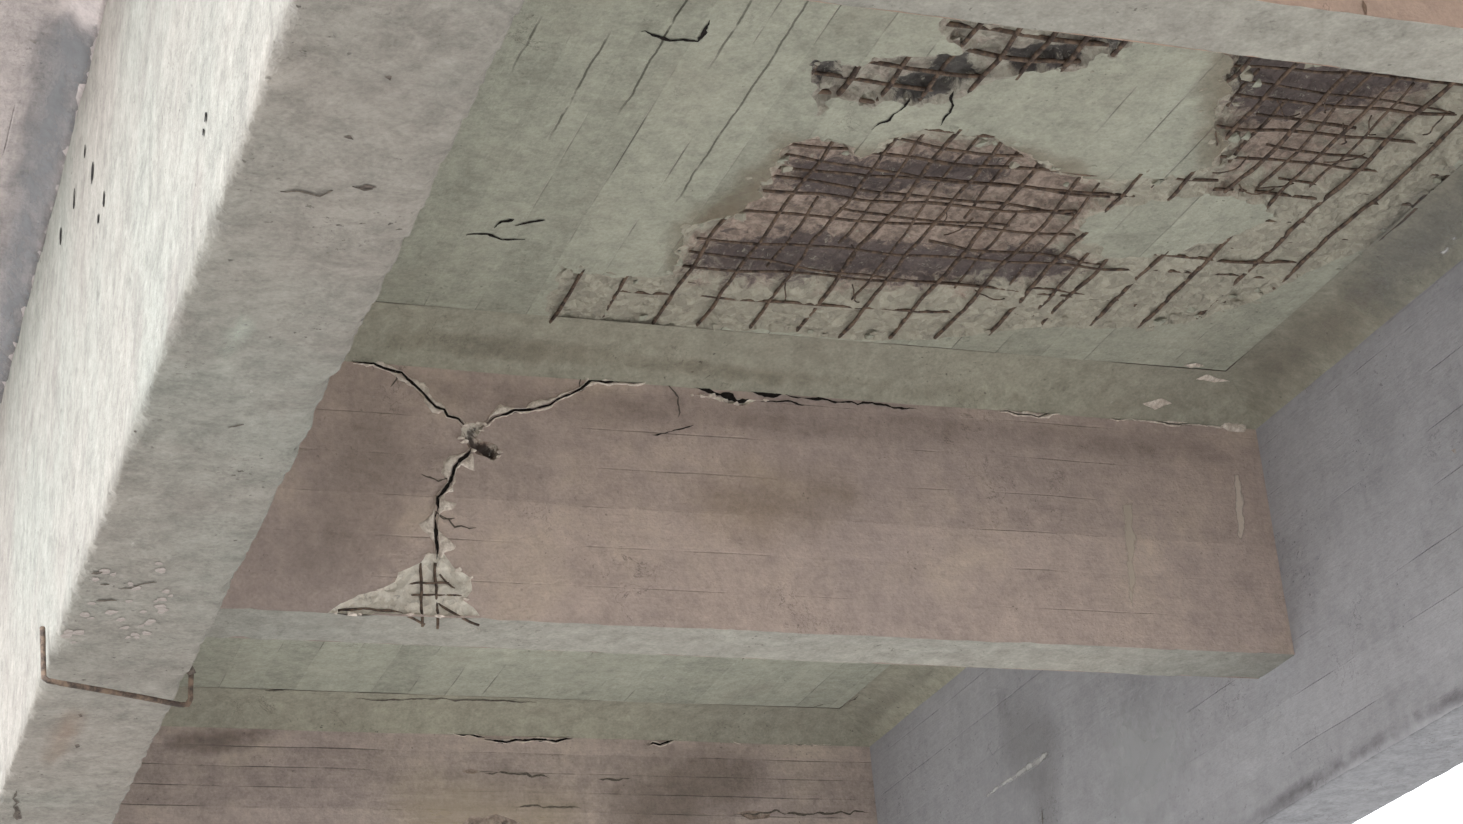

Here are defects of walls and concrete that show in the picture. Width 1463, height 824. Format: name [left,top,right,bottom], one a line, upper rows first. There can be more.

spalling [802,18,1133,116]
spalling [545,53,1463,349]
crack [353,361,916,559]
spalling [328,552,480,629]
crack [357,698,630,809]
crack [647,739,682,747]
crack [732,808,868,816]